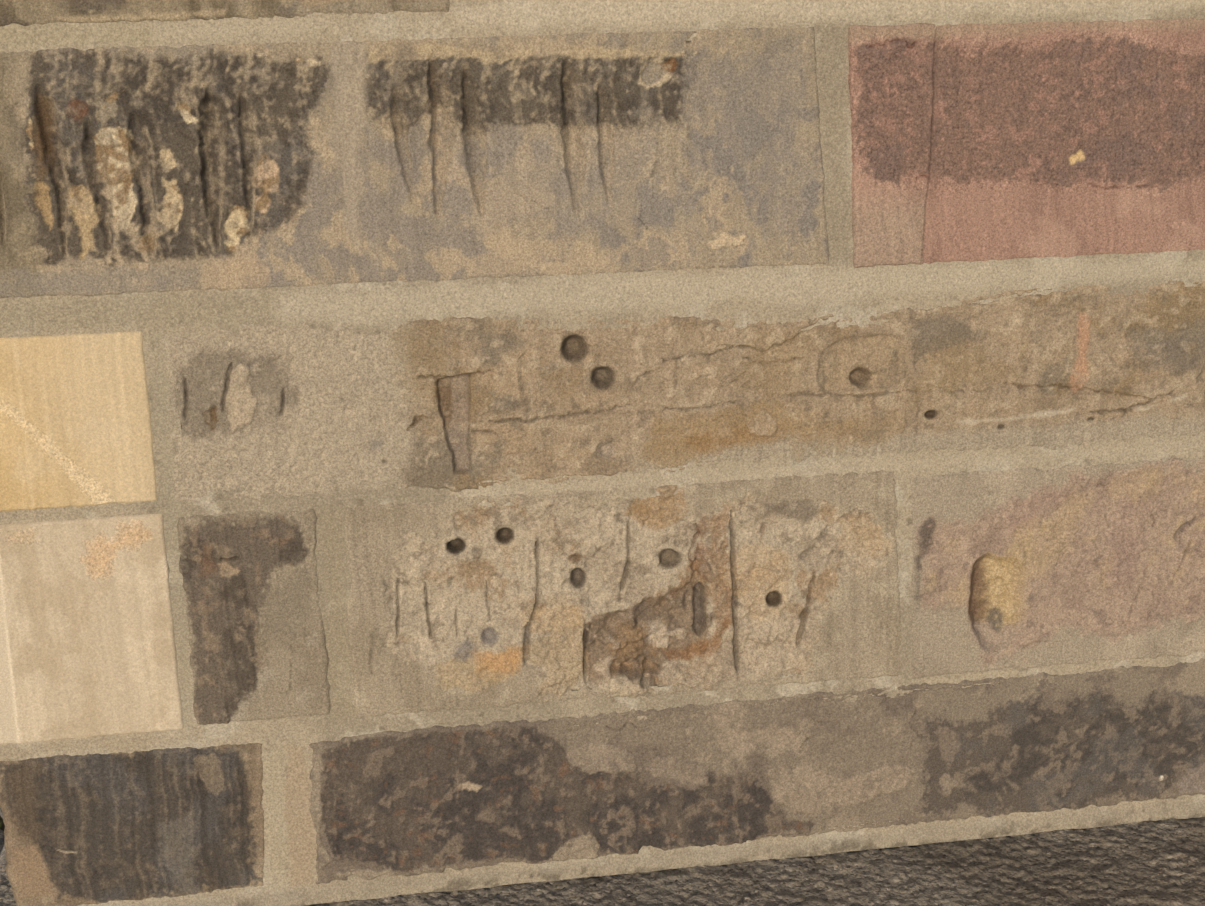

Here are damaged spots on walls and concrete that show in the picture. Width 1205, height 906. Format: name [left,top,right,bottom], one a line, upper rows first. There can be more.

crack [862,24,940,264]
crack [810,312,874,330]
crack [403,412,432,435]
crack [408,365,497,383]
crack [475,457,760,486]
crack [463,340,1205,438]
spalling [374,471,963,823]
spalling [966,550,1030,656]